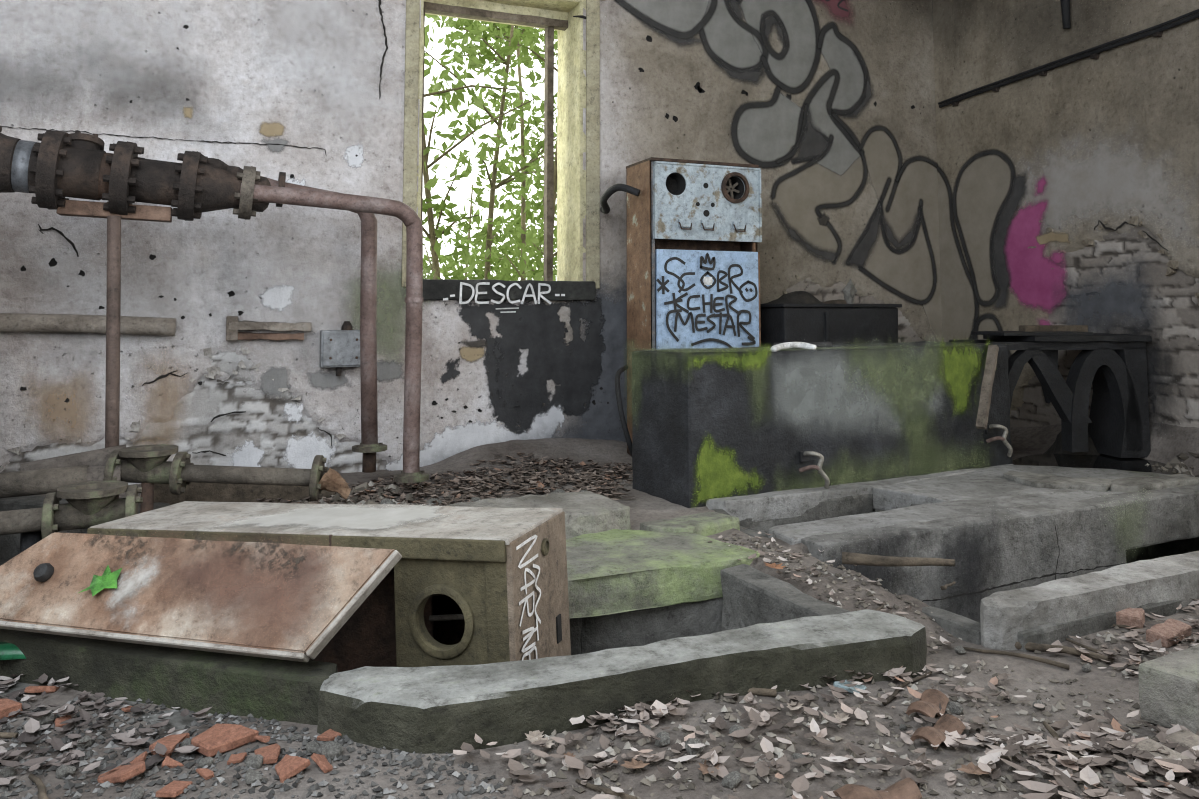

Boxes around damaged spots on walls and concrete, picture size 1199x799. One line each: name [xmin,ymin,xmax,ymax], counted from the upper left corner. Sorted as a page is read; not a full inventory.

crack [378,0,388,99]
flaking render [0,346,388,473]
peeling [432,297,609,435]
water stain [785,356,937,423]
flaking render [1010,376,1061,428]
flaking render [1028,206,1199,428]